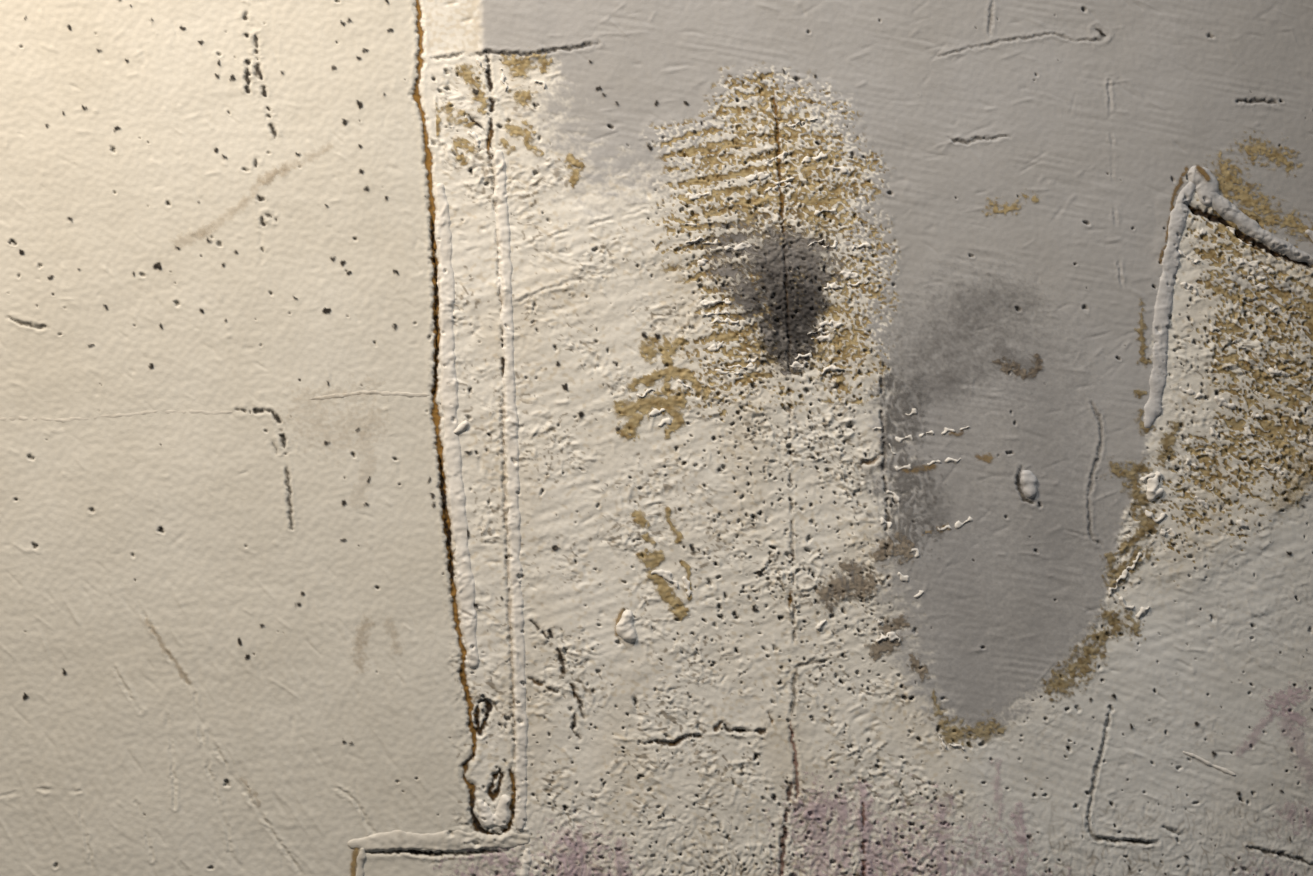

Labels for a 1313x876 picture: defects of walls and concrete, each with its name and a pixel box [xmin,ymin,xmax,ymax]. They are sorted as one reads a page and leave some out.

crack [243,409,292,526]
crack [374,0,587,856]
peeling [614,68,900,441]
leakage [758,318,812,375]
peeling [1042,131,1313,701]
crack [648,660,826,876]
crack [859,804,867,876]
crack [1249,847,1313,865]